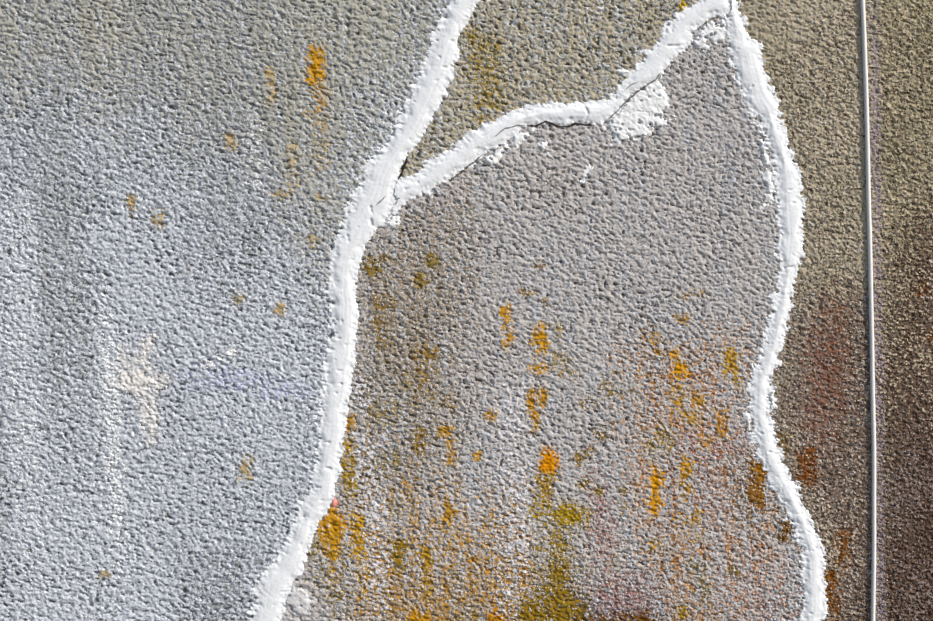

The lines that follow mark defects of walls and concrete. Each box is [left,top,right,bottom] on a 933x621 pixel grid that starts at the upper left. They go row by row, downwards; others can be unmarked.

corrosion [264,66,278,110]
corrosion [271,42,333,202]
corrosion [273,301,287,322]
corrosion [370,290,401,365]
corrosion [498,298,517,354]
crack [247,0,829,621]
corrosion [515,285,582,435]
corrosion [776,280,857,490]
corrosion [912,266,933,303]
corrosion [302,312,803,621]
corrosion [824,526,856,621]